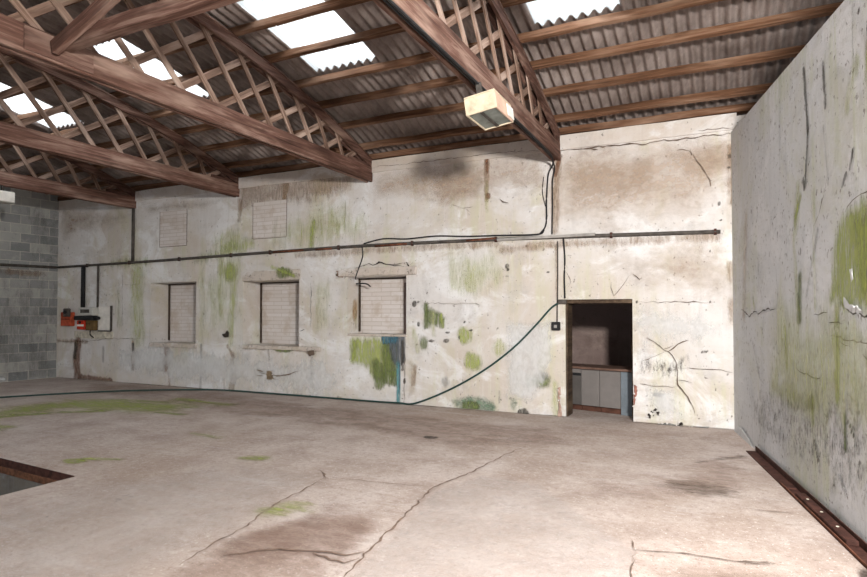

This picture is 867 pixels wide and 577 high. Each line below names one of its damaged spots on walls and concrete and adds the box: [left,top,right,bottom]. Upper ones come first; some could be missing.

crack [560,128,728,185]
leakage [371,336,404,402]
leakage [463,401,495,410]
crack [644,337,732,413]
leakage [756,335,867,485]
crack [181,448,521,577]
crack [630,541,776,577]